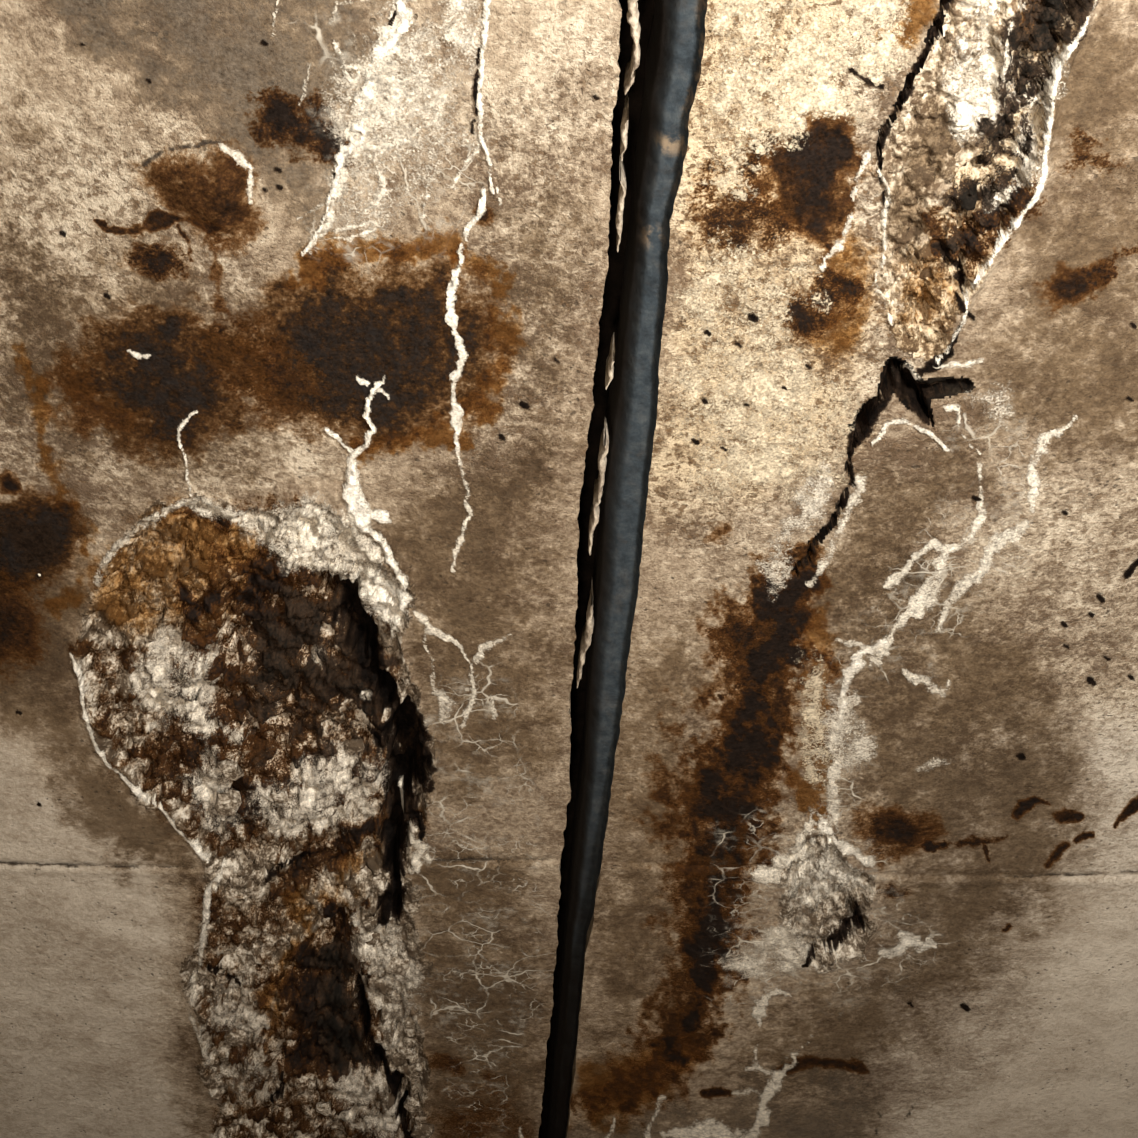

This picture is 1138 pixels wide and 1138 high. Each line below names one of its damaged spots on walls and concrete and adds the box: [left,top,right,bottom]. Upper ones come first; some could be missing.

rust [49,246,511,458]
rust [246,88,360,168]
damp [185,0,483,257]
crack [445,0,502,572]
rust [687,117,865,259]
crack [819,0,954,326]
crack [790,325,983,587]
damp [817,384,1078,837]
crack [1123,559,1138,579]
spalling [68,492,438,1138]
rust [570,538,844,1124]
damp [645,1035,813,1138]